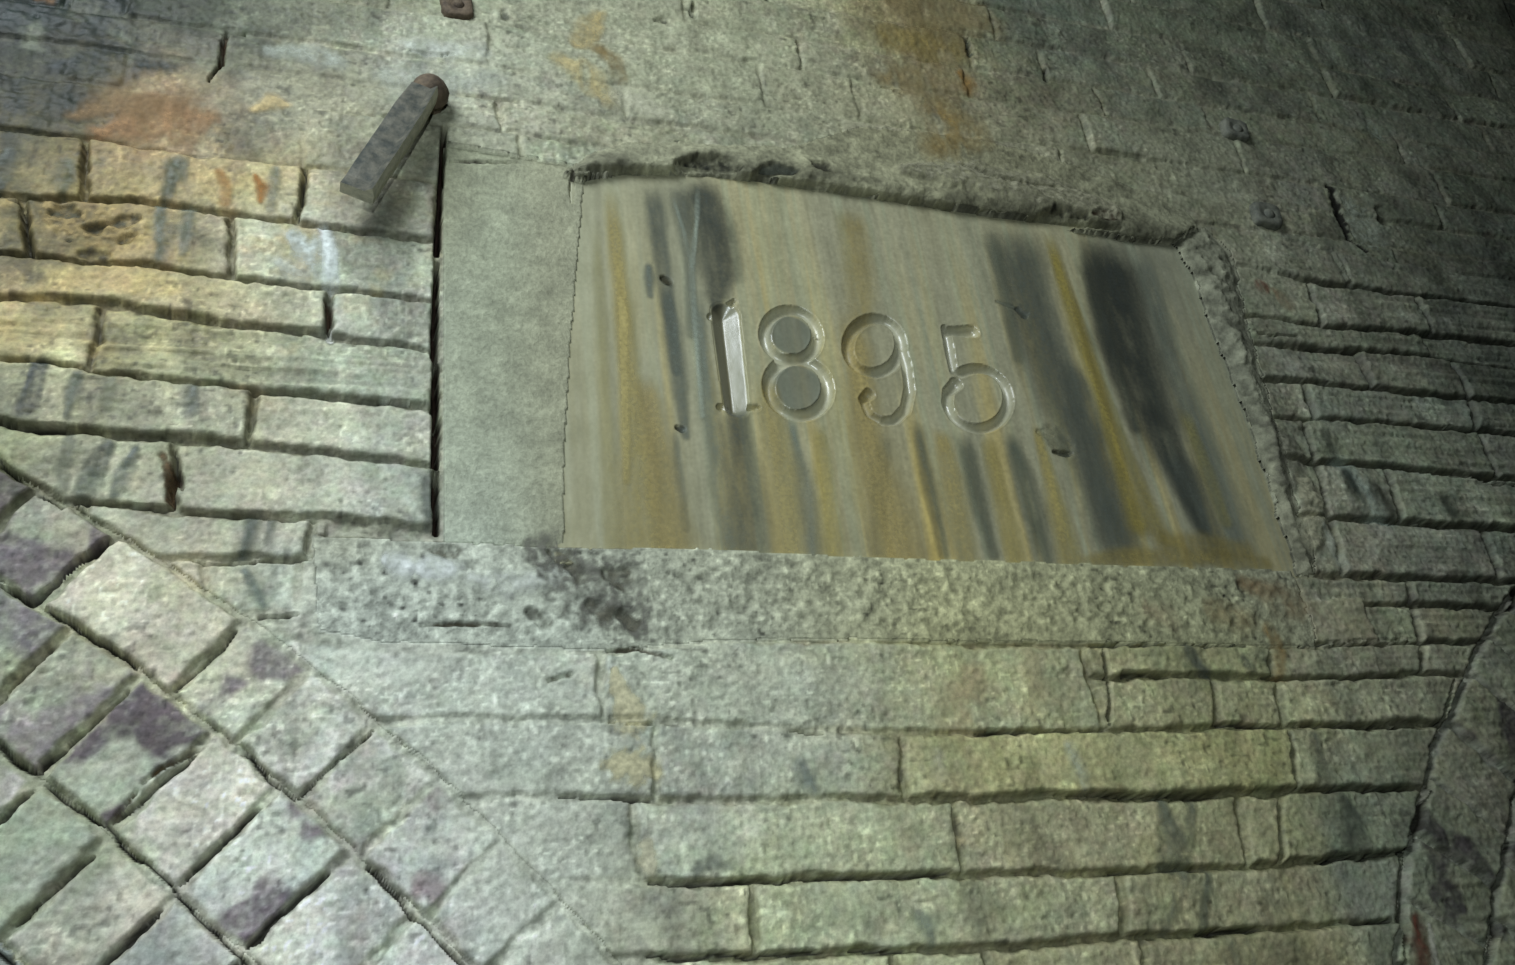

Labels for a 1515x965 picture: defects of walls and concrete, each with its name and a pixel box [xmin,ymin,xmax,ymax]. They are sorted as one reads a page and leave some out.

water stain [0,0,126,35]
corrosion [251,96,288,111]
water stain [154,158,195,259]
crack [1325,186,1369,253]
crack [430,137,483,537]
water stain [646,188,732,437]
water stain [713,415,751,480]
water stain [916,432,941,529]
water stain [962,447,994,557]
water stain [991,244,1124,557]
water stain [1086,252,1214,543]
spalling [524,536,649,638]